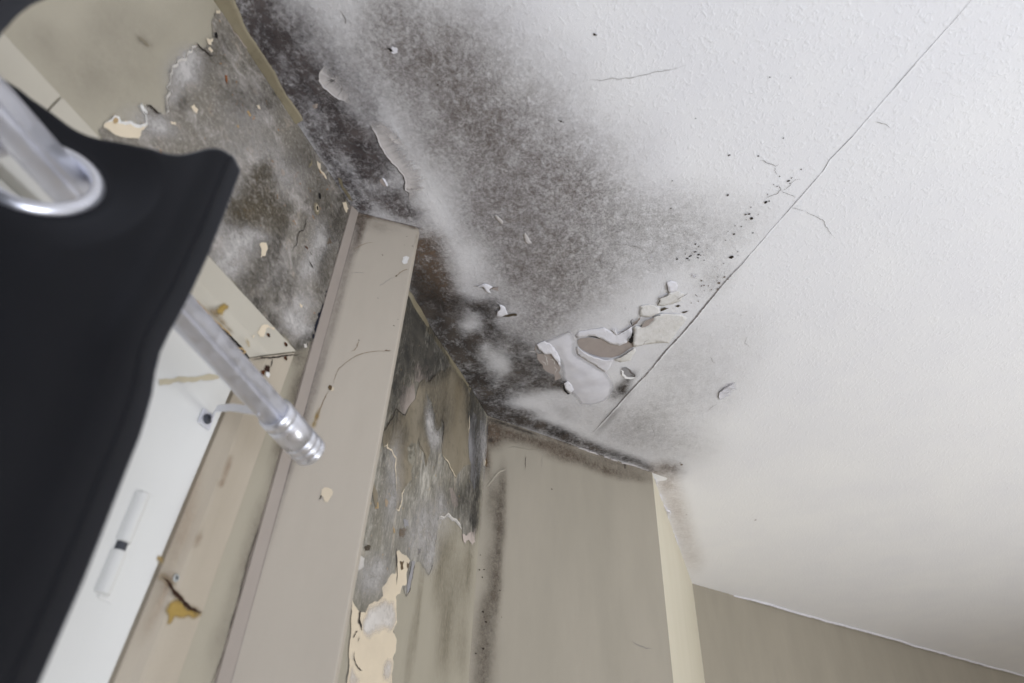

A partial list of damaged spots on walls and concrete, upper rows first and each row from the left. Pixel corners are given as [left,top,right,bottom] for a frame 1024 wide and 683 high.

flaking render [99,9,350,350]
peeling [371,124,418,195]
flaking render [346,298,488,683]
leakage [227,0,650,531]
peeling [547,281,697,405]